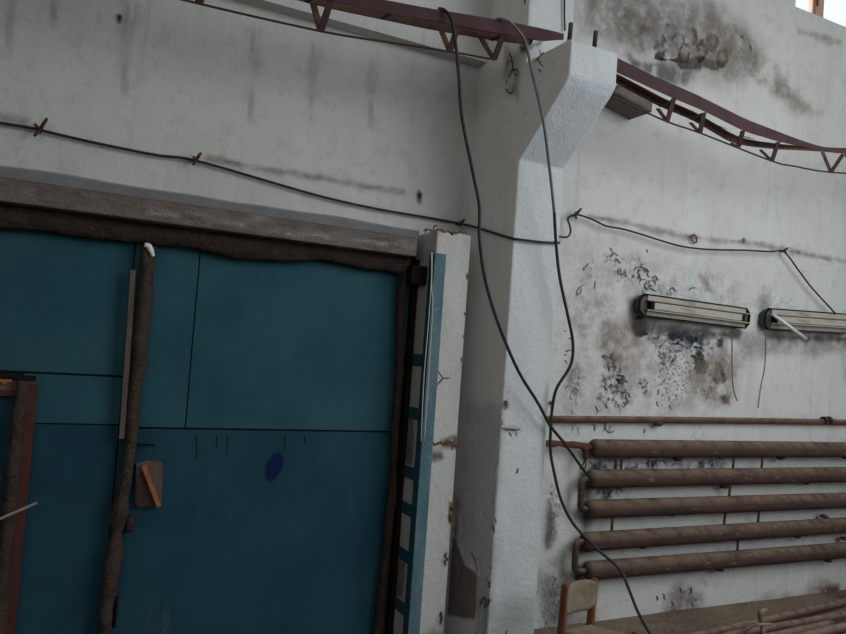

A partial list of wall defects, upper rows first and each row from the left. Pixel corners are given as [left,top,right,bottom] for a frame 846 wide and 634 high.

leakage [632,60,691,83]
leakage [641,324,734,410]
flaking render [439,538,491,634]